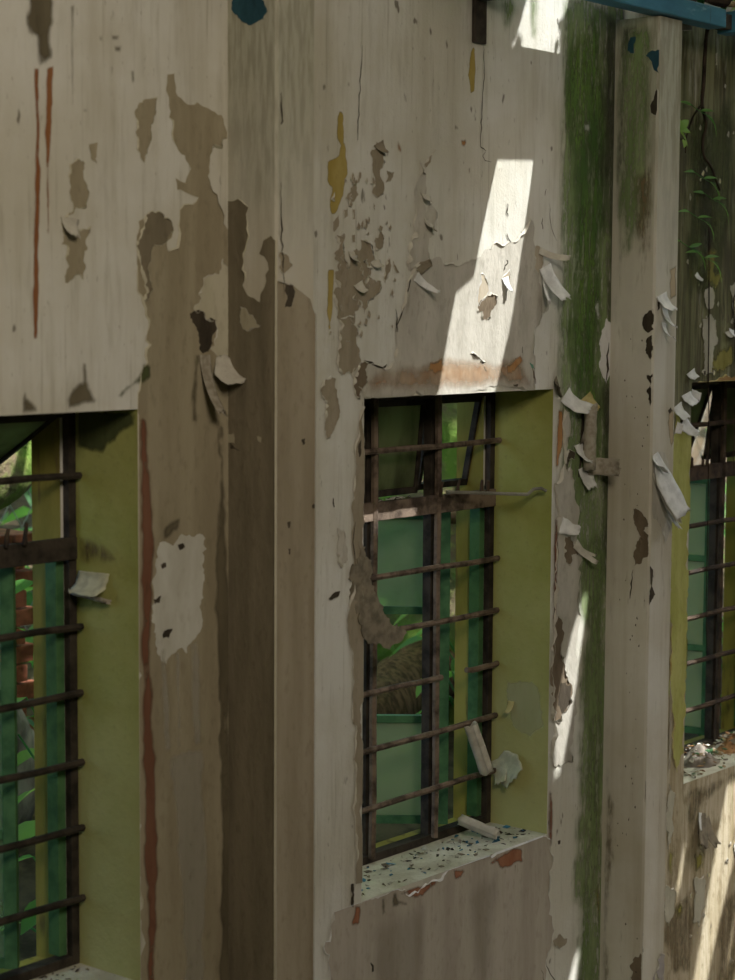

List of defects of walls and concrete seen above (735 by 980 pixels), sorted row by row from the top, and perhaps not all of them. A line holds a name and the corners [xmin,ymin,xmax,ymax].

corrosion [33,67,53,338]
peeling [61,143,98,283]
damp [566,18,650,457]
flaking render [642,291,678,360]
peeling [674,368,735,438]
damp [688,106,733,300]
peeling [68,570,112,604]
peeling [134,74,571,980]
peeling [630,452,691,605]
corrosion [141,420,158,980]
damp [583,475,618,903]
peeling [697,812,735,863]